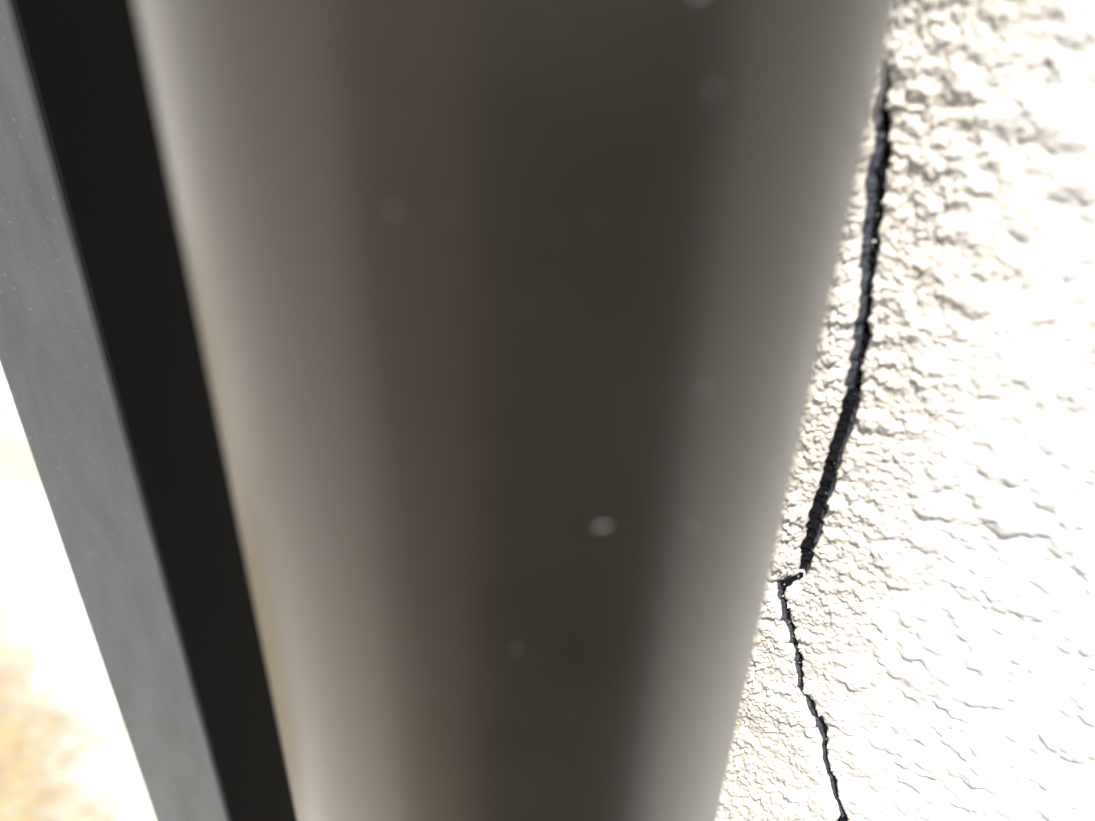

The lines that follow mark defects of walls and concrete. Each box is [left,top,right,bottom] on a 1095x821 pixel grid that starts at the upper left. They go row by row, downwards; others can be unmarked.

crack [777,61,921,821]